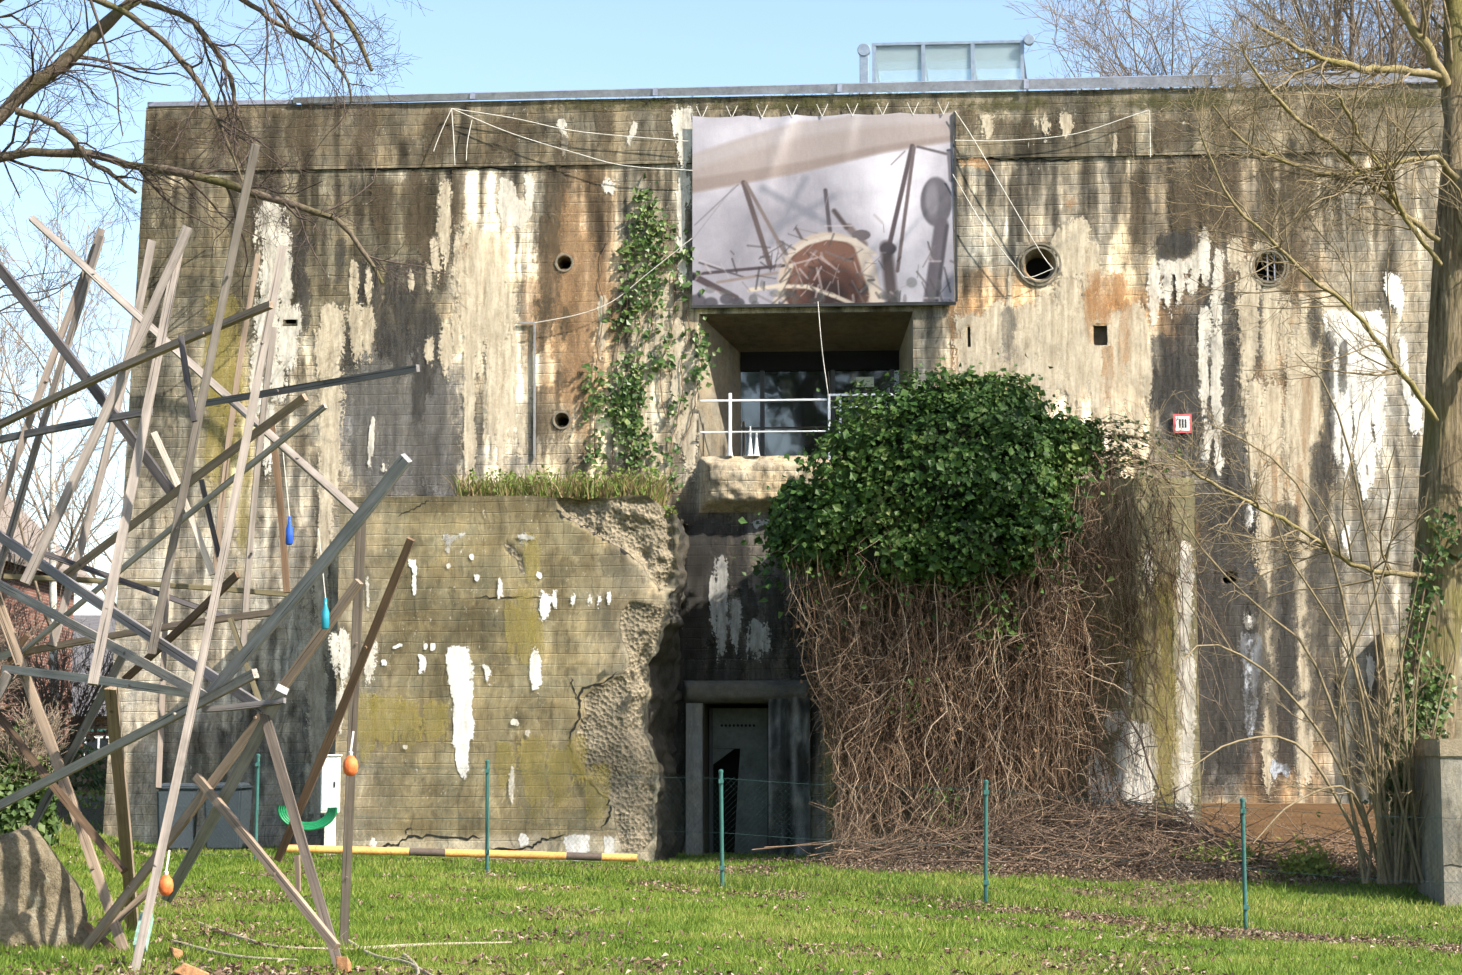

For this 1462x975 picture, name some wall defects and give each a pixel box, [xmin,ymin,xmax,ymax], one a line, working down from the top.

leakage [248,92,924,840]
leakage [941,88,1441,803]
peeling [441,532,465,568]
peeling [328,628,402,733]
peeling [418,643,492,780]
spalling [504,499,677,861]
crack [567,673,635,831]
crack [383,828,565,851]